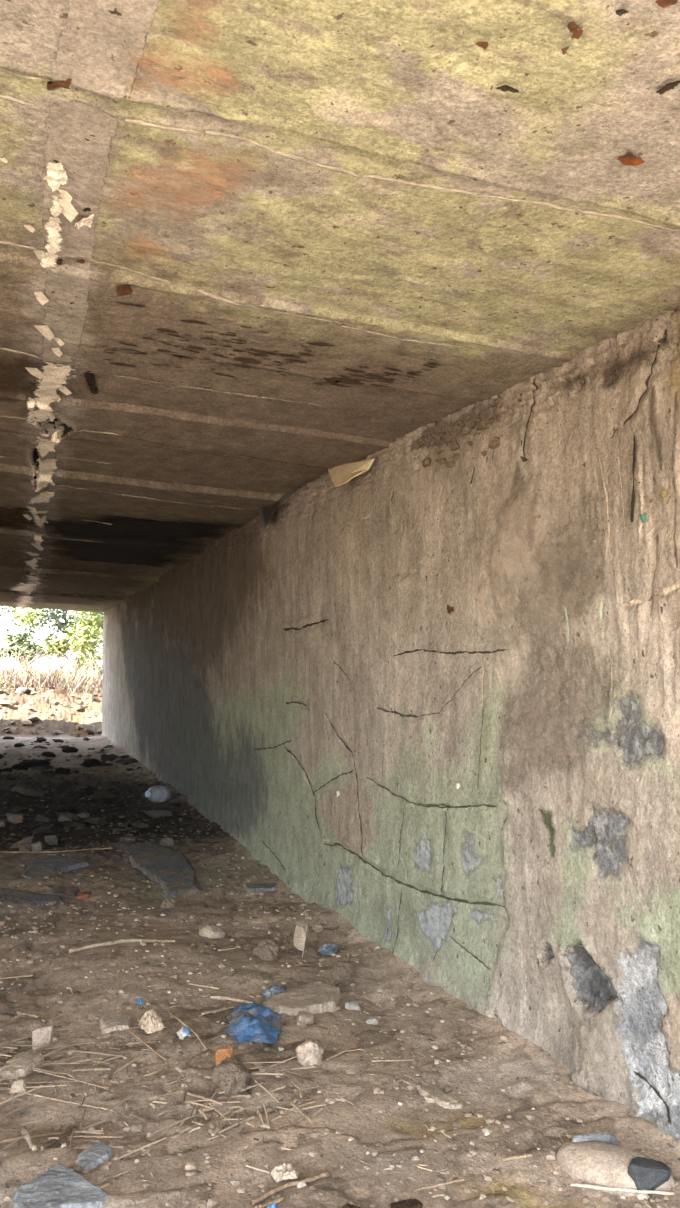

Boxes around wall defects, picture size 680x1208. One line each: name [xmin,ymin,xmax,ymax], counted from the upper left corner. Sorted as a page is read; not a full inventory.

crack [284,619,328,631]
spalling [578,696,665,764]
crack [254,649,509,971]
spalling [570,807,630,877]
spalling [546,937,680,1140]